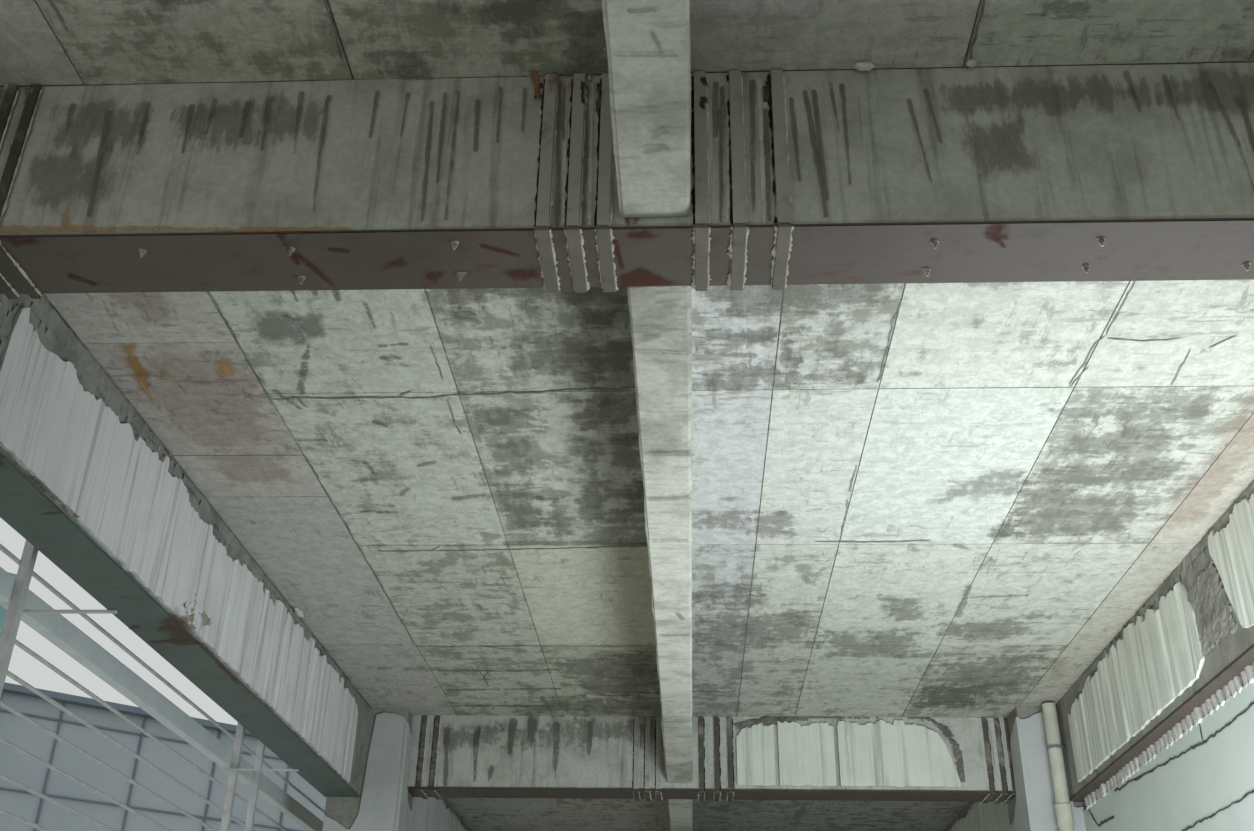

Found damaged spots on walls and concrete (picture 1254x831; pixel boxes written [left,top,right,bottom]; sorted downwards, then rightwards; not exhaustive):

water stain [87,111,112,216]
water stain [314,95,330,195]
corrosion [123,346,152,399]
corrosion [29,475,80,518]
flaking render [0,294,330,658]
flaking render [1074,479,1254,697]
corrosion [150,615,239,685]
flaking render [733,716,879,729]
flaking render [907,717,965,782]
crack [1088,702,1254,831]